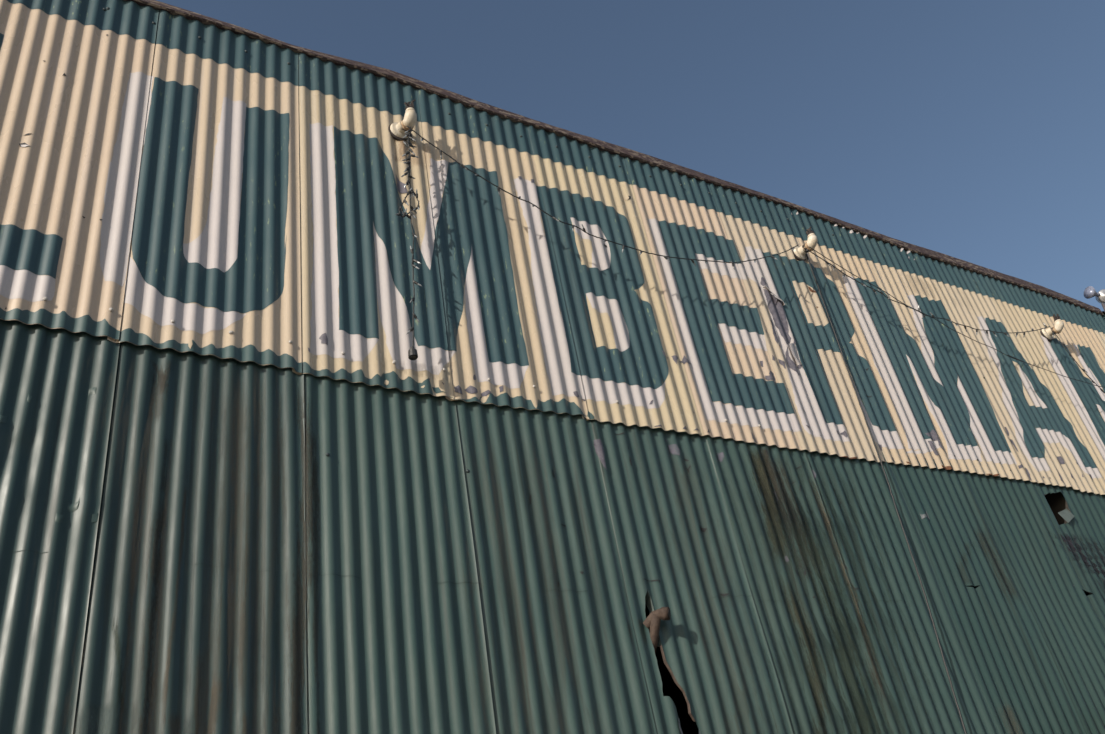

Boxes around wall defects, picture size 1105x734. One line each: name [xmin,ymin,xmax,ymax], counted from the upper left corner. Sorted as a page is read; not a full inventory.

peeling [421,375,511,405]
peeling [757,277,802,381]
damp [139,510,165,734]
damp [291,417,319,734]
damp [751,451,882,734]